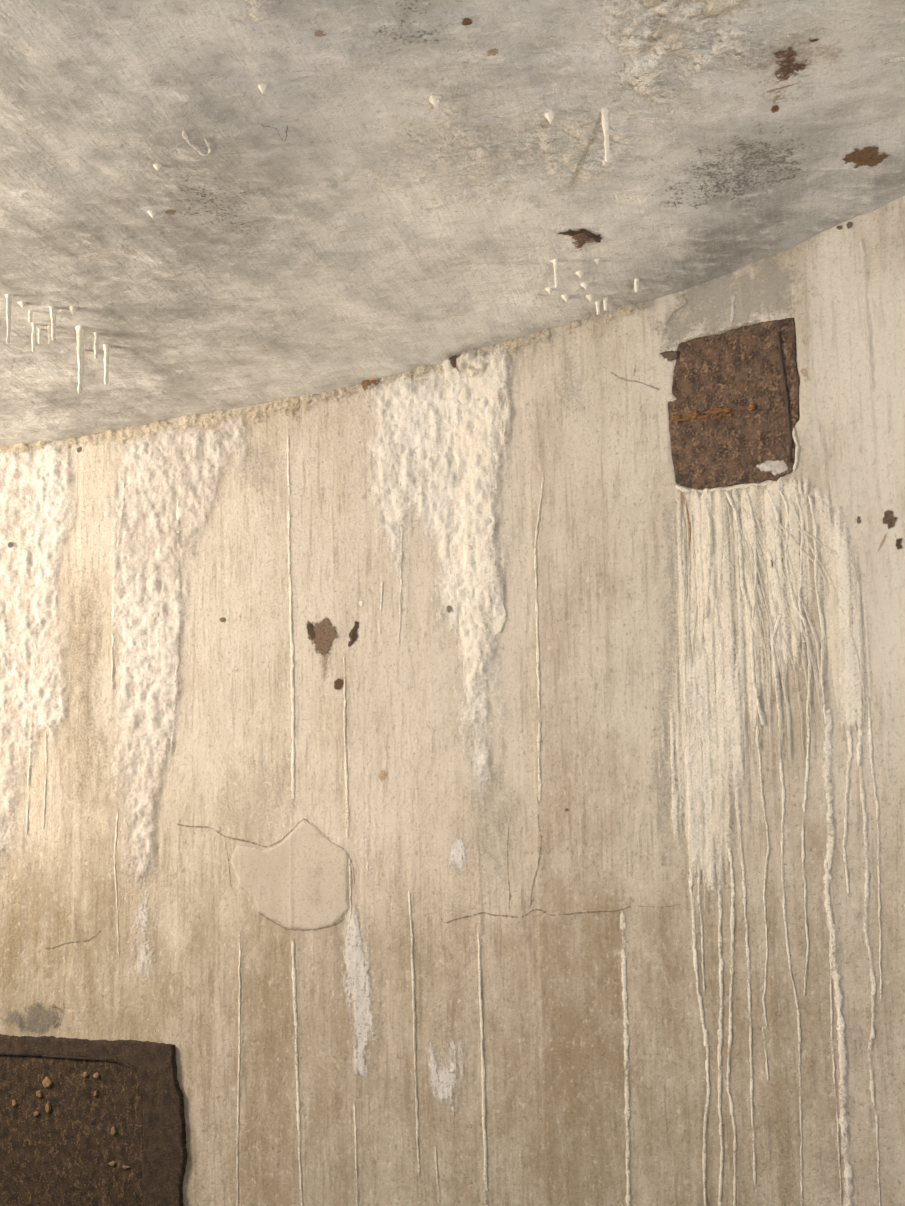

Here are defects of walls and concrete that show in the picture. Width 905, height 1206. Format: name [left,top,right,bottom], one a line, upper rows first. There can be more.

damp [355,0,804,208]
rust [768,46,811,113]
rust [842,147,890,168]
rust [558,229,602,252]
damp [0,329,552,978]
rust [307,617,359,690]
crack [179,819,354,887]
damp [658,476,882,1206]